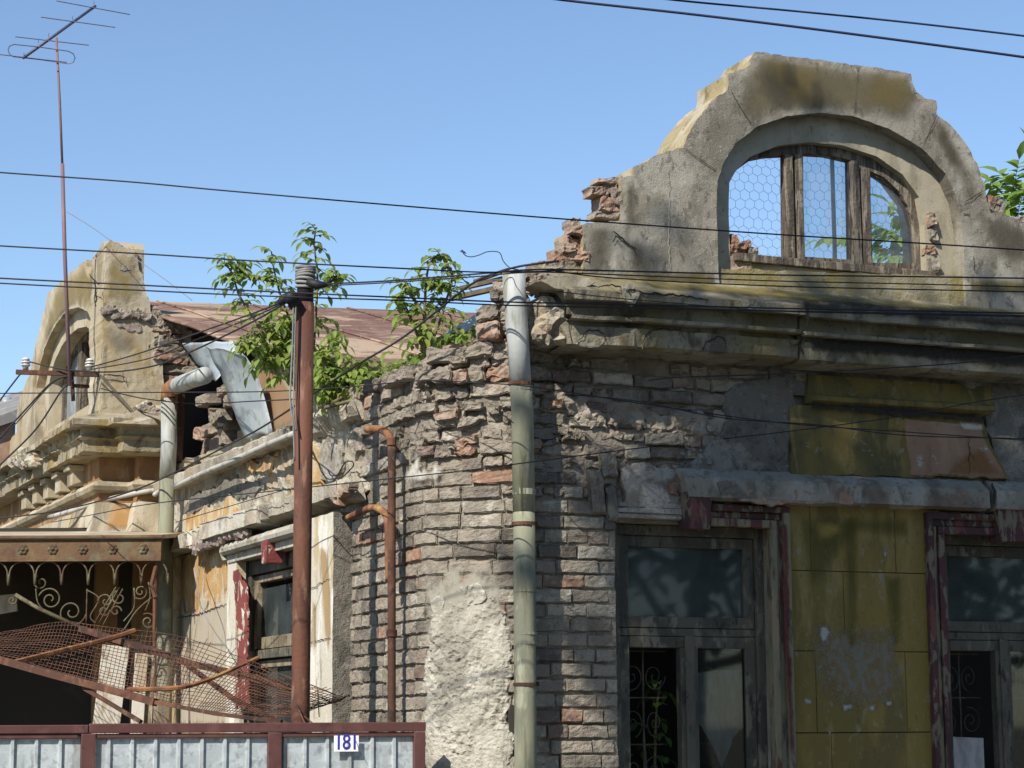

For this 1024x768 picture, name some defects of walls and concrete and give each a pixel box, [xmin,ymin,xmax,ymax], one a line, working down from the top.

spalling [525,175,623,302]
spalling [921,213,942,273]
spalling [100,304,201,384]
spalling [312,280,514,768]
spalling [529,327,768,768]
peeling [174,569,251,723]